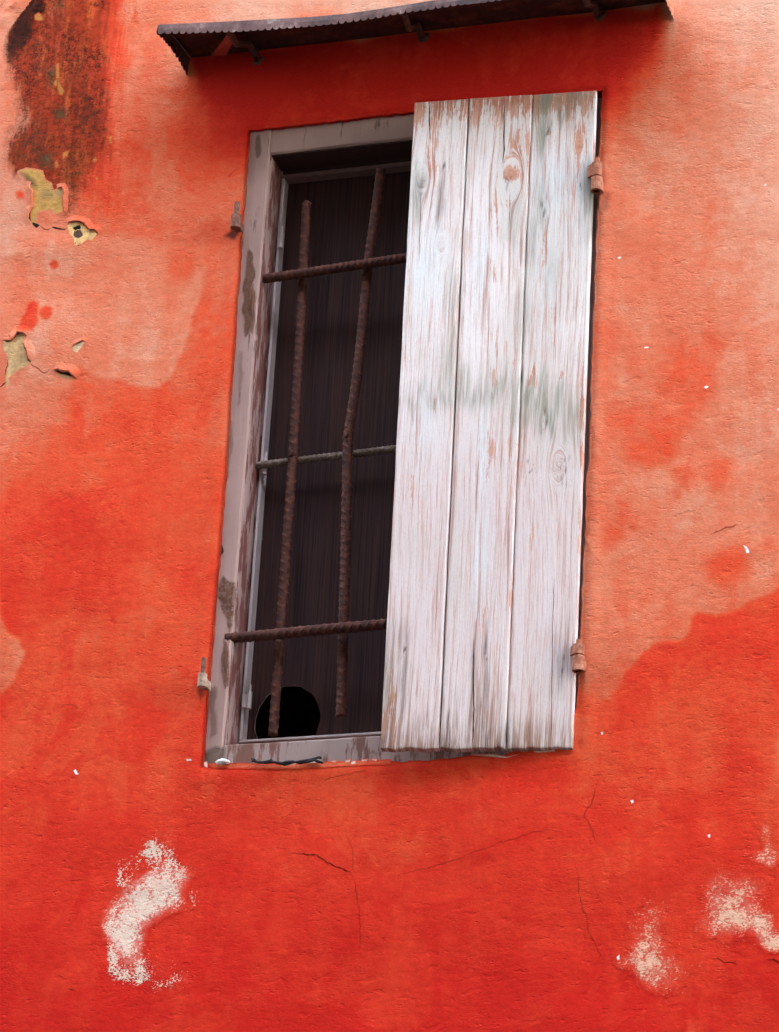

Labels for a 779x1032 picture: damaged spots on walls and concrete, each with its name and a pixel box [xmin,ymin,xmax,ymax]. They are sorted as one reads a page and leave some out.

flaking render [17,160,102,246]
flaking render [0,325,88,389]
water stain [343,529,779,985]
crack [295,853,349,872]